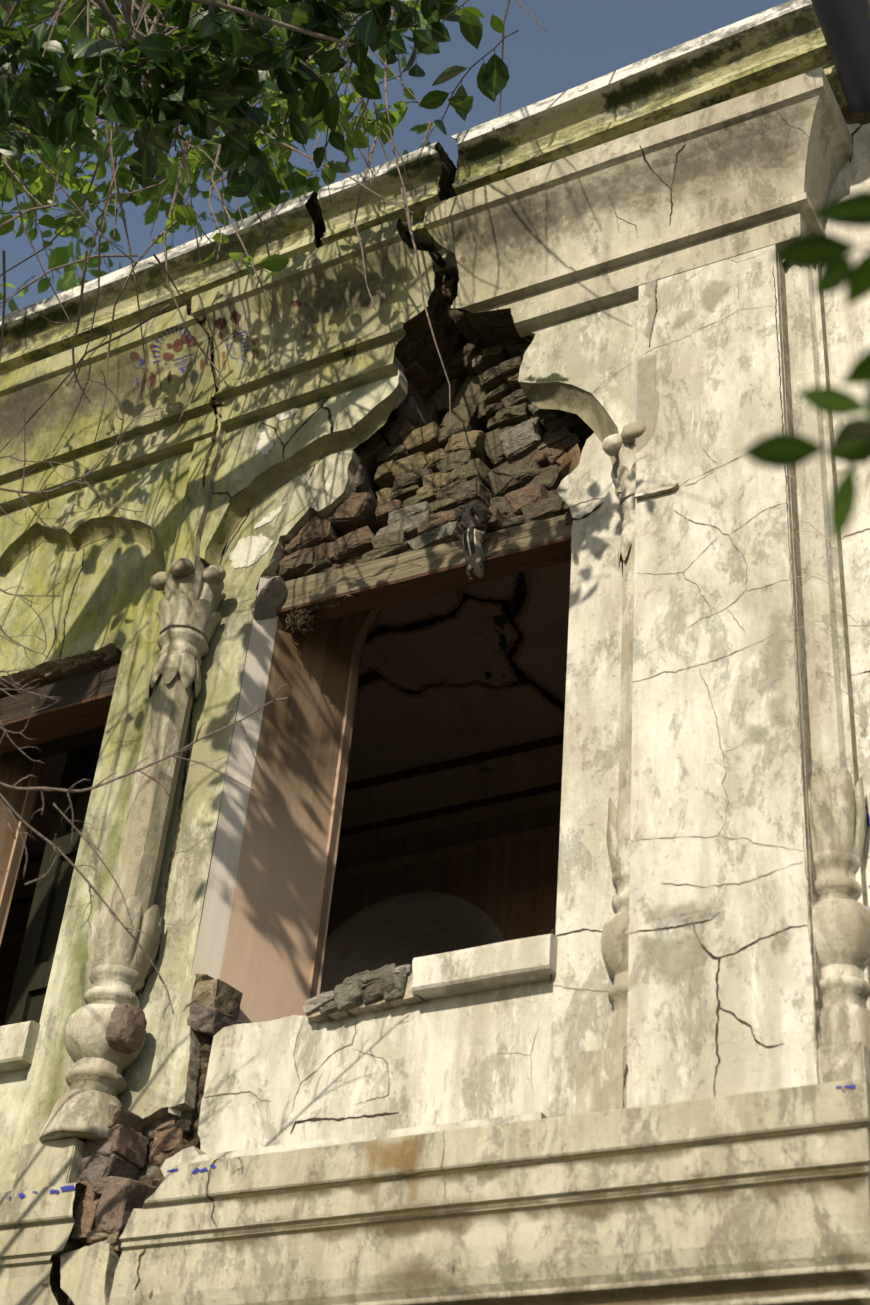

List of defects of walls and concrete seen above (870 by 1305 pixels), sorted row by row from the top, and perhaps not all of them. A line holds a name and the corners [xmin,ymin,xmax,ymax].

crack [188,308,334,564]
spalling [228,222,594,627]
crack [591,250,784,432]
crack [357,497,605,715]
crack [550,449,870,1096]
crack [203,1015,398,1134]
spalling [303,964,425,1023]
crack [621,1064,629,1107]
crack [134,1250,145,1290]
crack [206,1159,217,1226]